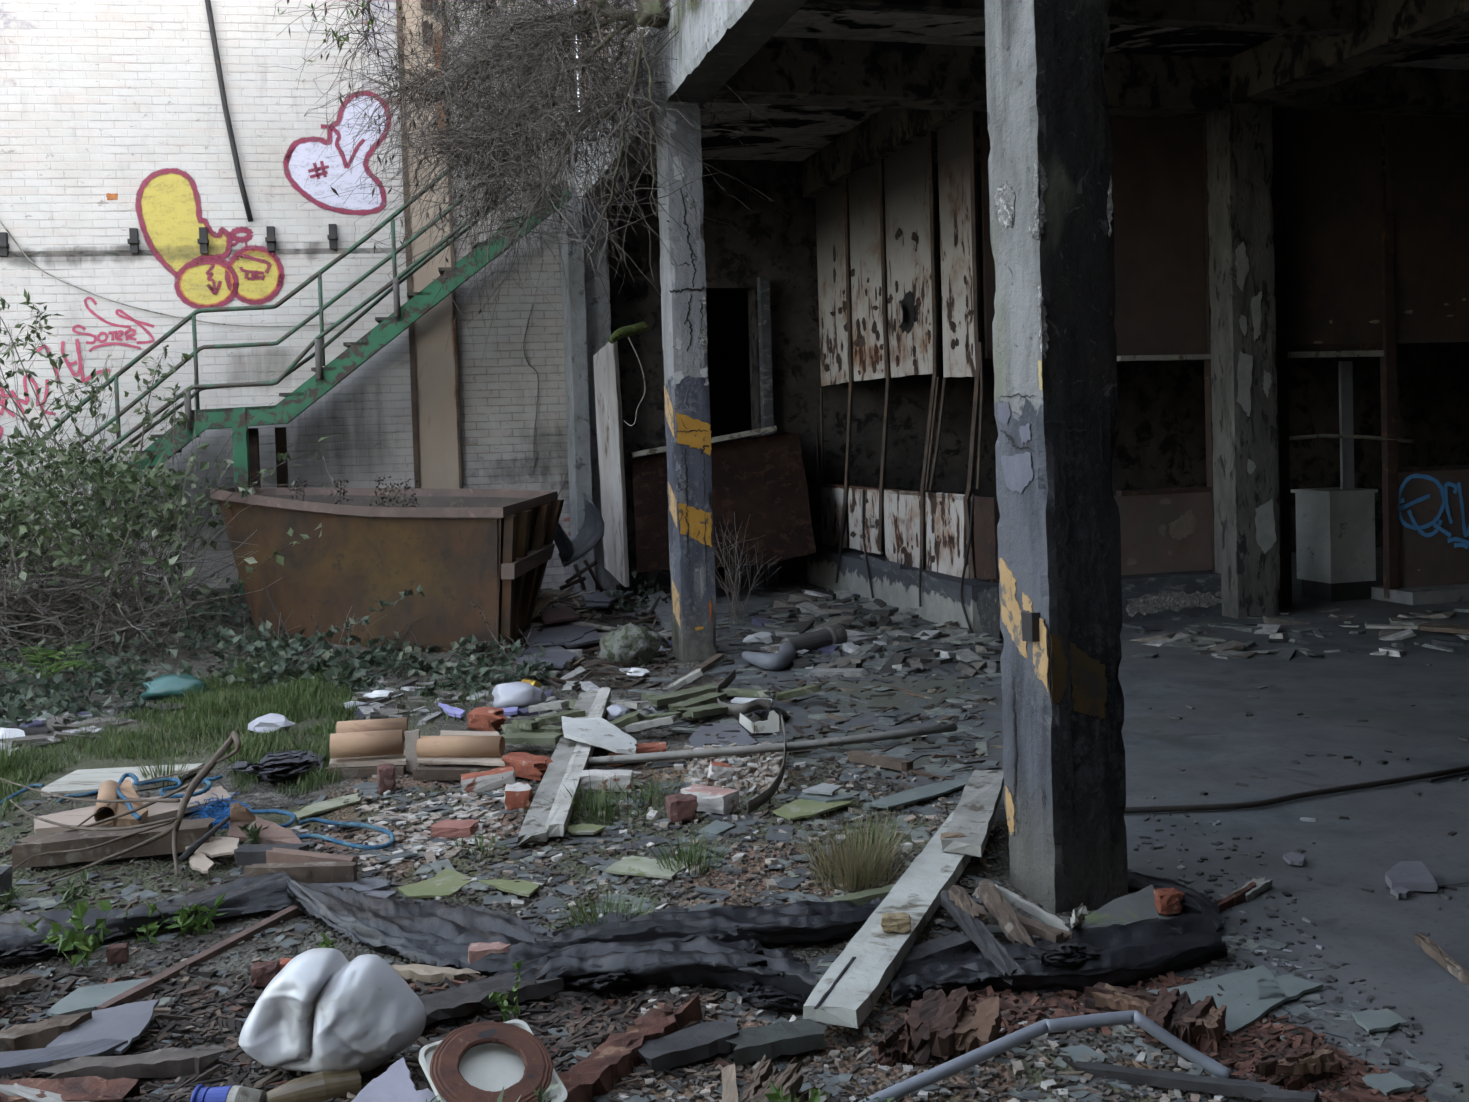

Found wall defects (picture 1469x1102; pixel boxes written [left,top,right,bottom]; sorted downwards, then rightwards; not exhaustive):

crack [667,189,710,591]
peeling [997,401,1034,494]
peeling [1235,241,1272,417]
peeling [1255,499,1276,554]